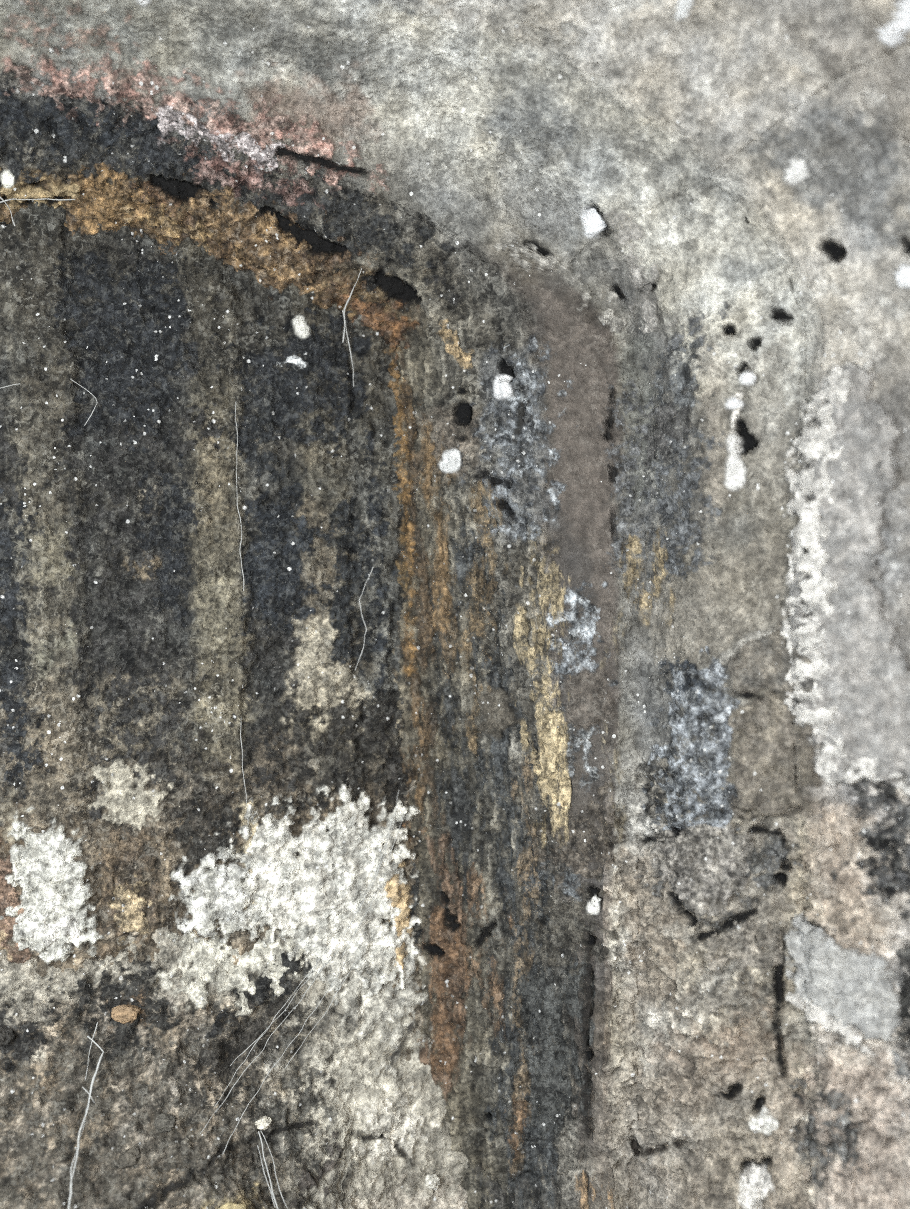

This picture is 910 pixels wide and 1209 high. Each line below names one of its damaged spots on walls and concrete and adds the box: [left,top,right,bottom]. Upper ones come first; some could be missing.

water stain [0,71,462,314]
corrosion [0,163,571,1176]
water stain [0,239,633,1209]
corrosion [576,1170,613,1209]